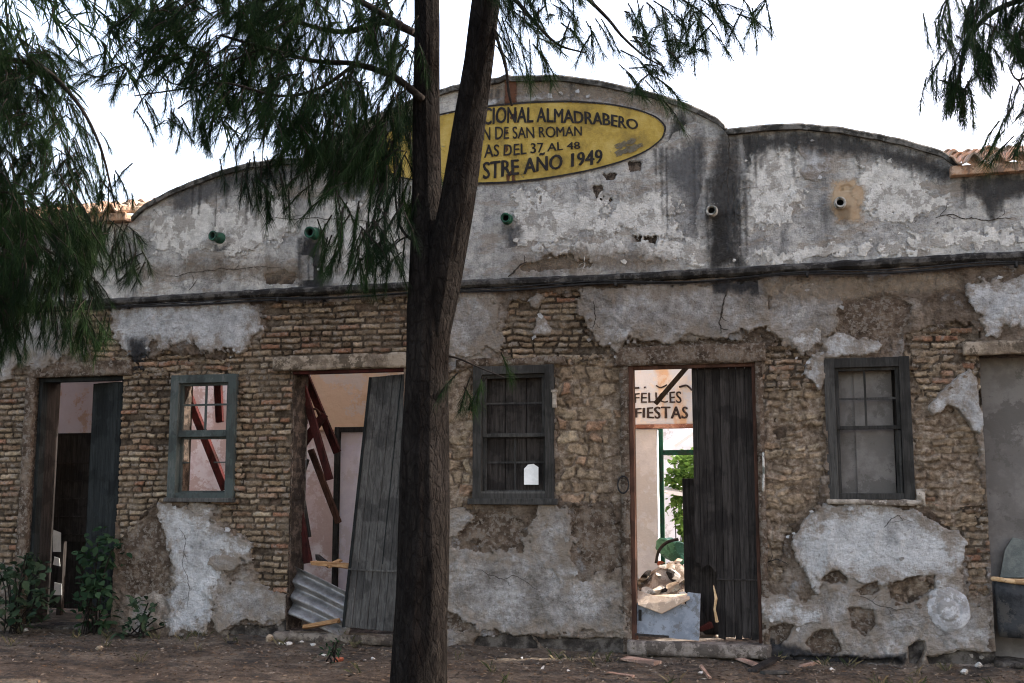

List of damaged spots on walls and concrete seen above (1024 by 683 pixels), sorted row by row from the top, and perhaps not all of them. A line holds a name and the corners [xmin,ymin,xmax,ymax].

peeling [150,196,300,265]
damp [171,165,298,226]
flaking render [266,269,298,285]
peeling [509,172,713,272]
damp [489,82,949,274]
peeling [739,139,833,234]
peeling [732,155,1024,266]
crack [936,206,1010,221]
damp [962,175,1024,219]
flaking render [0,297,407,637]
peeling [447,274,1024,665]